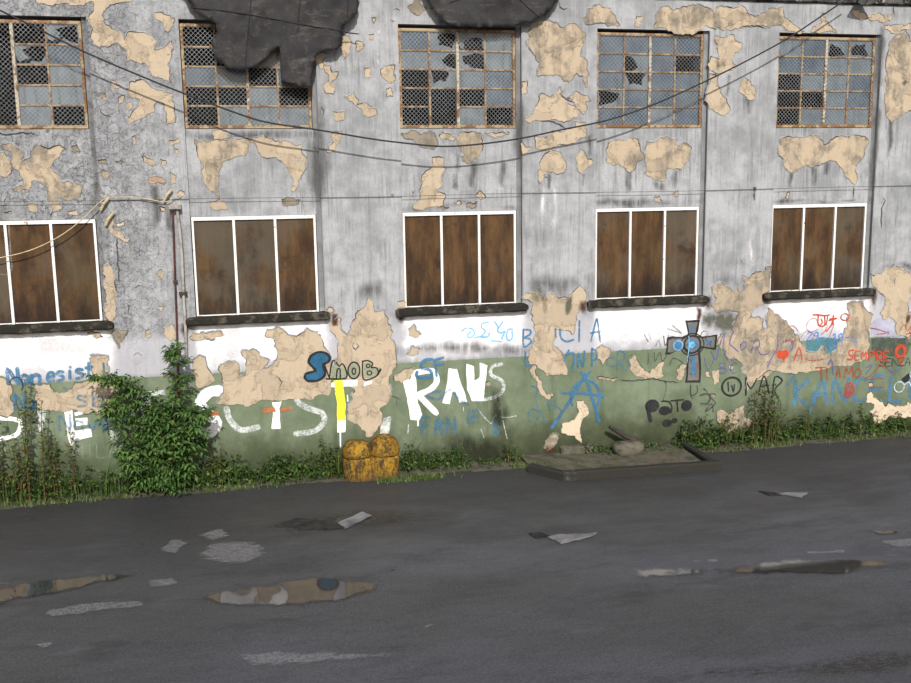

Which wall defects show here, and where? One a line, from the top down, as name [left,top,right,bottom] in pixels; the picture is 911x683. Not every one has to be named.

peeling [35,0,177,125]
spalling [520,2,620,184]
spalling [654,3,837,116]
spalling [850,8,911,123]
spalling [0,142,83,216]
spalling [194,128,308,210]
peeling [400,128,509,211]
spalling [777,133,869,185]
peeling [190,297,422,438]
peeling [522,285,587,400]
spalling [705,264,911,398]
peeling [866,382,911,423]